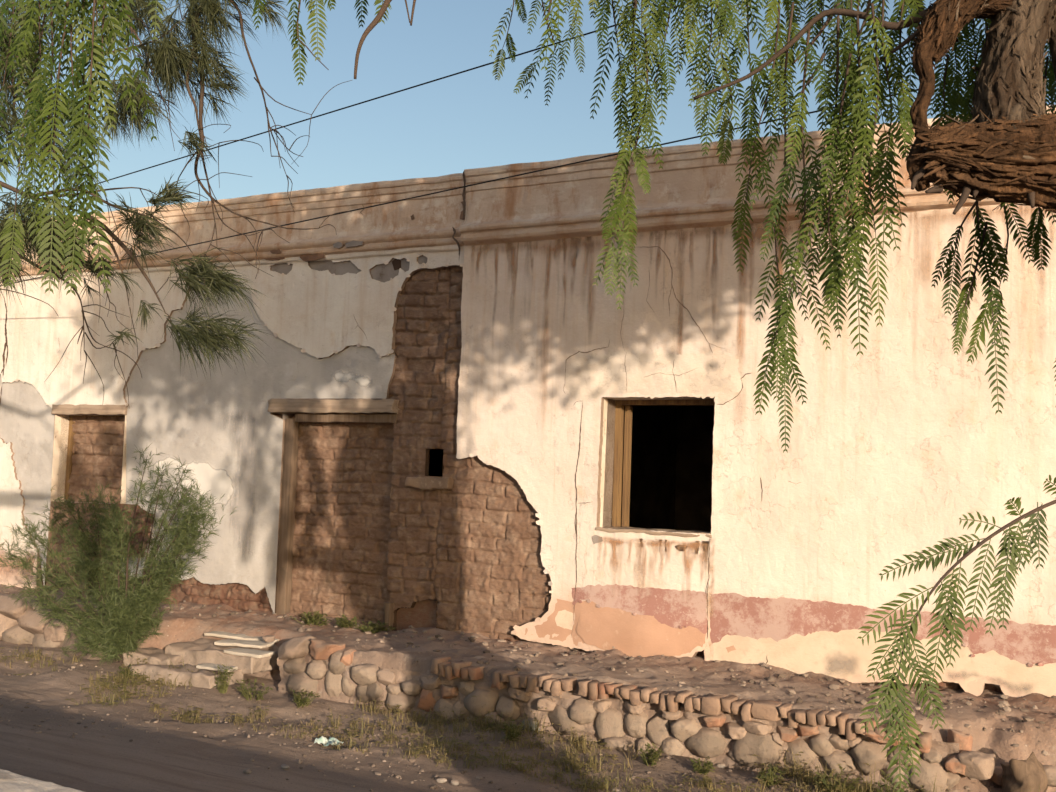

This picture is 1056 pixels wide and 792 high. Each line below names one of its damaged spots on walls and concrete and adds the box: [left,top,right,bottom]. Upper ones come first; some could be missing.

peeling [0,375,55,588]
flaking render [122,240,661,646]
crack [563,246,724,638]
peeling [628,626,1056,697]